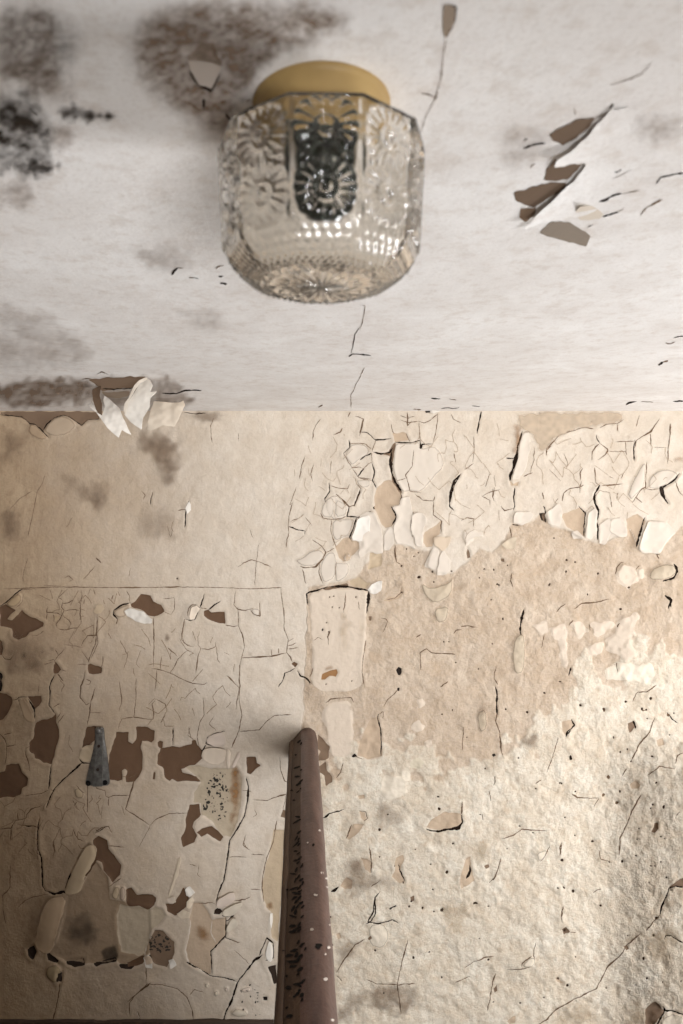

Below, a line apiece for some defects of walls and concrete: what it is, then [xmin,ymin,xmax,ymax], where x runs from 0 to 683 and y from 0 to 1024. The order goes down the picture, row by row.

mould [0,102,51,174]
mould [63,108,113,122]
damp [140,7,333,129]
crack [421,5,457,131]
peeling [514,107,660,247]
damp [0,379,85,407]
peeling [1,376,185,438]
spalling [335,477,452,583]
crack [0,305,683,923]
spalling [109,727,260,847]
spalling [35,836,242,974]
crack [540,885,683,1024]